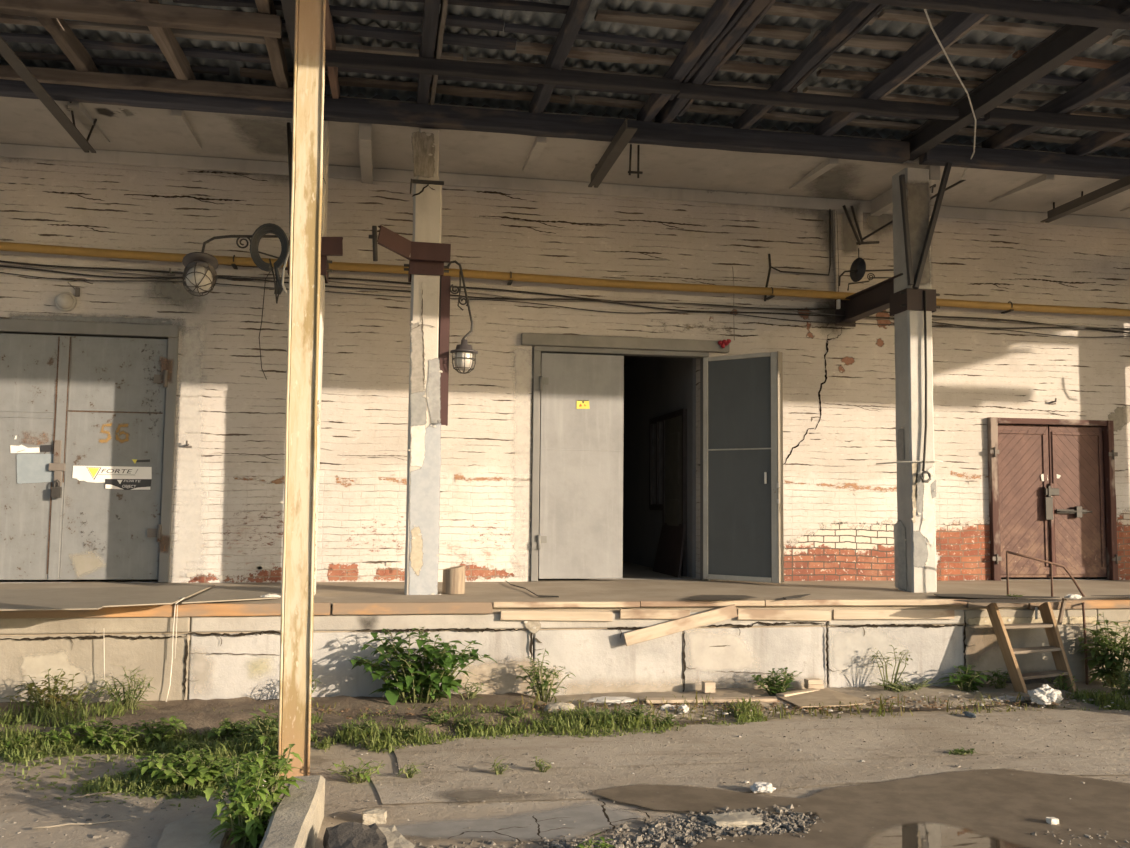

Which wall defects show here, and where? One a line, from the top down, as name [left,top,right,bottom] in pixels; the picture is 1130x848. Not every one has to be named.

spalling [873,310,891,347]
spalling [839,357,858,376]
crack [743,322,895,465]
peeling [314,321,443,595]
peeling [233,470,285,486]
peeling [454,474,532,482]
peeling [784,427,991,591]
peeling [1107,509,1130,580]
peeling [186,565,282,583]
peeling [460,562,514,582]
crack [448,799,650,843]